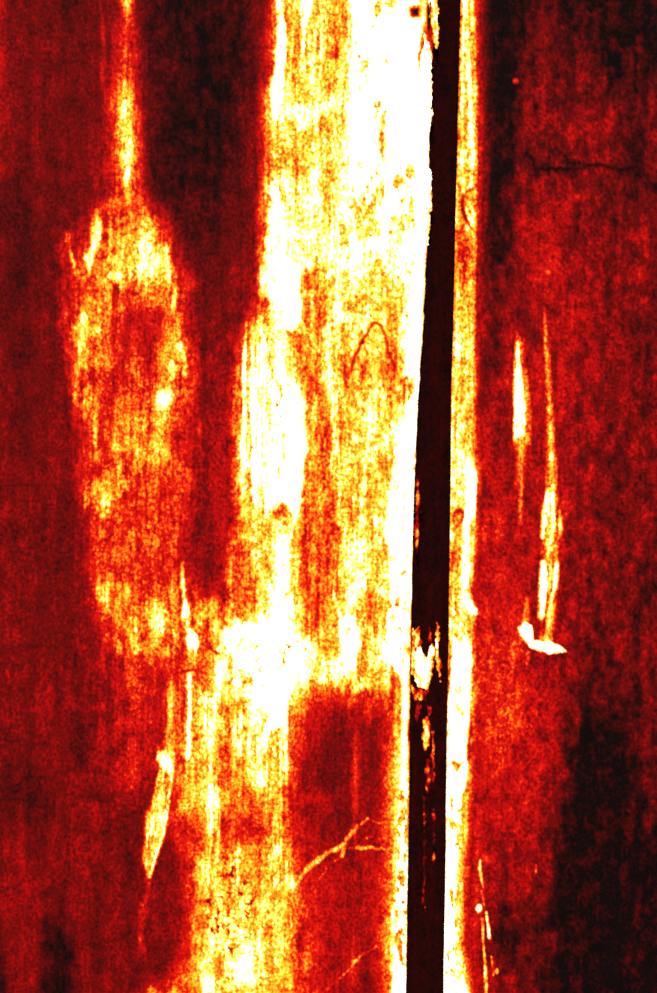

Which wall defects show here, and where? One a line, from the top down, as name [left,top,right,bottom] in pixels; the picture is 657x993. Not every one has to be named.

rust [50,0,410,993]
peeling [203,0,496,993]
peeling [511,305,570,673]
peeling [198,952,216,993]
crack [295,817,391,894]